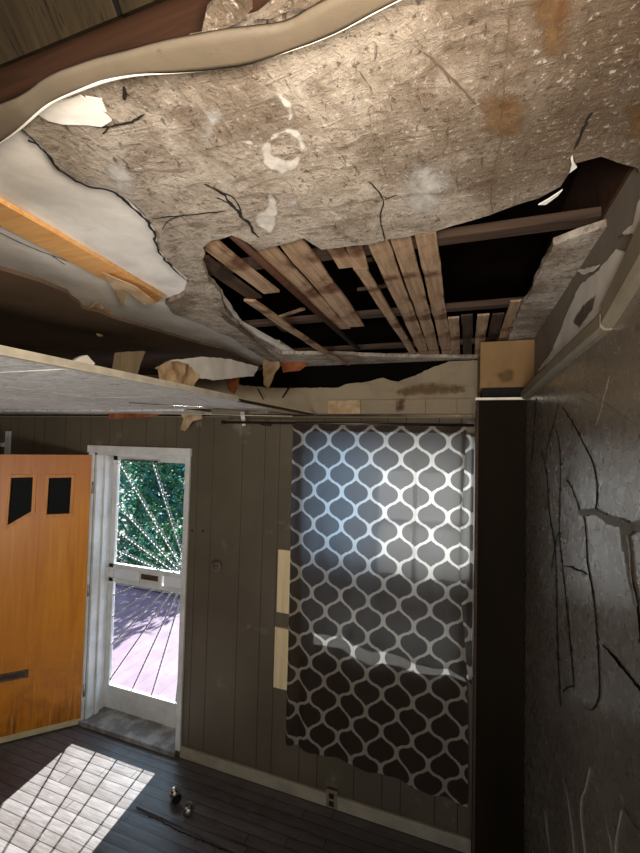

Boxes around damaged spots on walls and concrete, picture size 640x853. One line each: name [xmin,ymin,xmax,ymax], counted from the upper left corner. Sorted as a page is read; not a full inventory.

crack [21,129,259,282]
peeling [623,200,640,235]
peeling [538,249,625,371]
peeling [365,378,406,393]
crack [530,401,640,710]